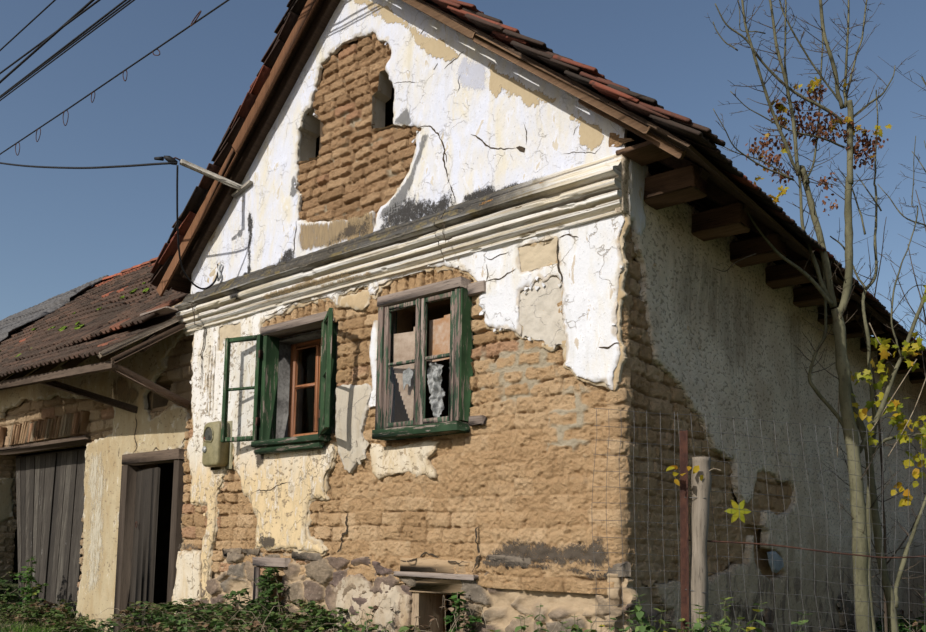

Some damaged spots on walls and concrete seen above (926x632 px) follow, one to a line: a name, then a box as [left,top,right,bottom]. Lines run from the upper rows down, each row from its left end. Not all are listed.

spalling [294,33,421,223]
water stain [273,135,536,266]
crack [421,125,456,202]
crack [471,124,527,152]
water stain [243,213,253,275]
peeling [220,323,241,349]
spalling [263,264,474,388]
spalling [0,395,115,447]
spalling [149,334,313,577]
spalling [309,226,792,595]
water stain [482,537,608,580]